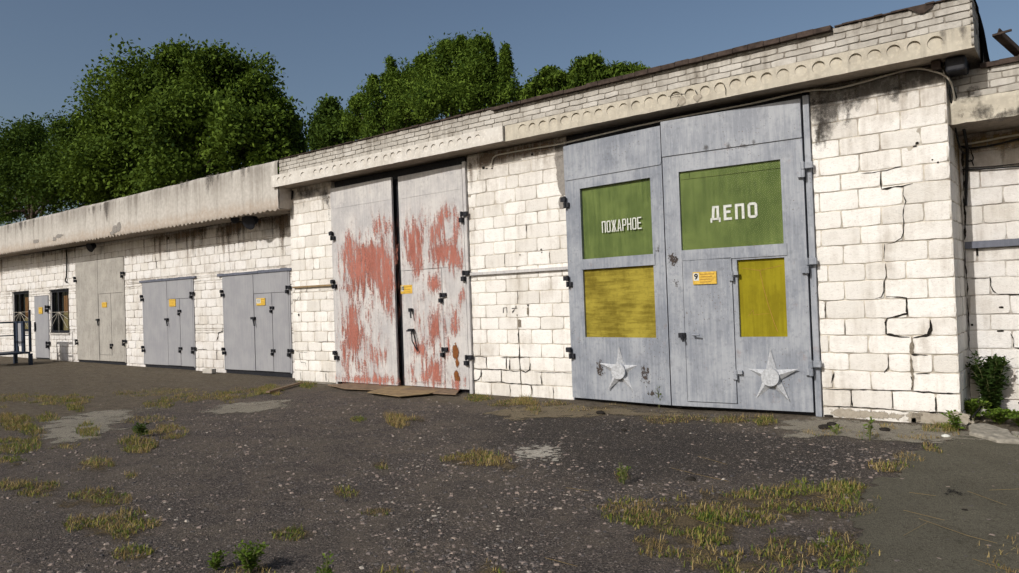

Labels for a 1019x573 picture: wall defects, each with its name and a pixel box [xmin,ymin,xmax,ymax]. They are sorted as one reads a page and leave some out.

leakage [810,65,946,138]